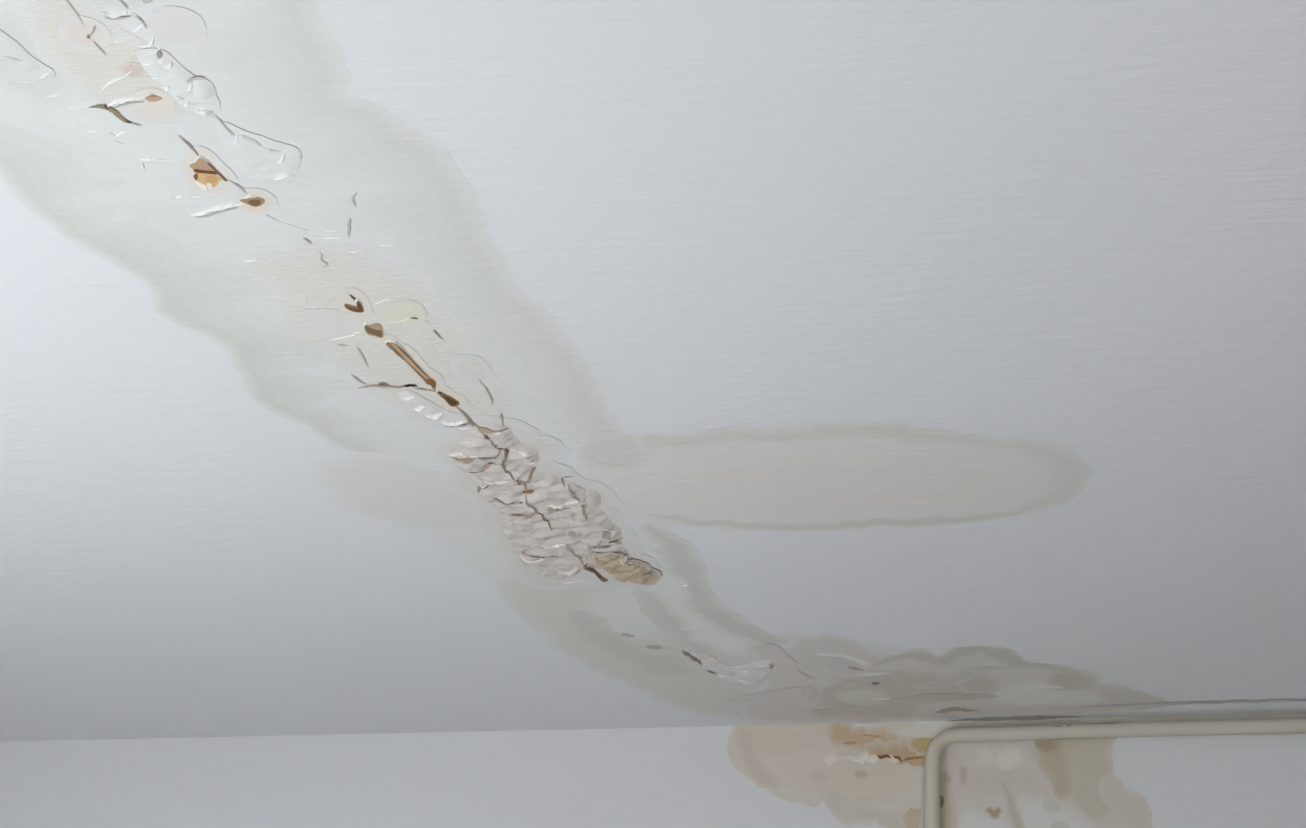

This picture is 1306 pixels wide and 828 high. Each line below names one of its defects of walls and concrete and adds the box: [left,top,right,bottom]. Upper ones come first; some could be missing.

crack [65,0,152,55]
crack [89,102,142,126]
peeling [102,22,212,116]
crack [196,180,247,218]
flaking render [171,155,340,239]
crack [347,192,357,237]
damp [0,0,1170,705]
crack [338,344,619,568]
peeling [328,295,633,584]
damp [311,444,1306,739]
damp [726,724,923,828]
damp [940,737,1153,828]